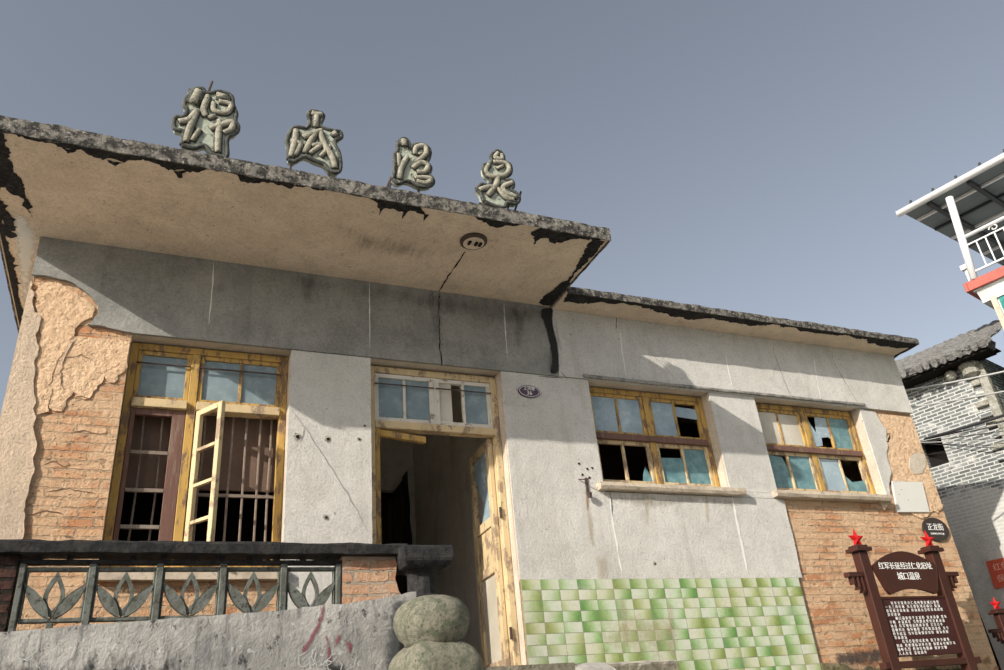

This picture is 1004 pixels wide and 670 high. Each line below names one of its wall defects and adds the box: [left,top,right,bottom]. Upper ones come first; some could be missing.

peeling [0,129,324,325]
peeling [370,198,428,220]
peeling [476,217,520,228]
spalling [34,282,95,415]
crack [438,252,465,365]
water stain [542,308,559,373]
peeling [531,228,917,356]
spalling [909,450,929,474]
crack [18,635,78,670]
crack [298,644,358,670]